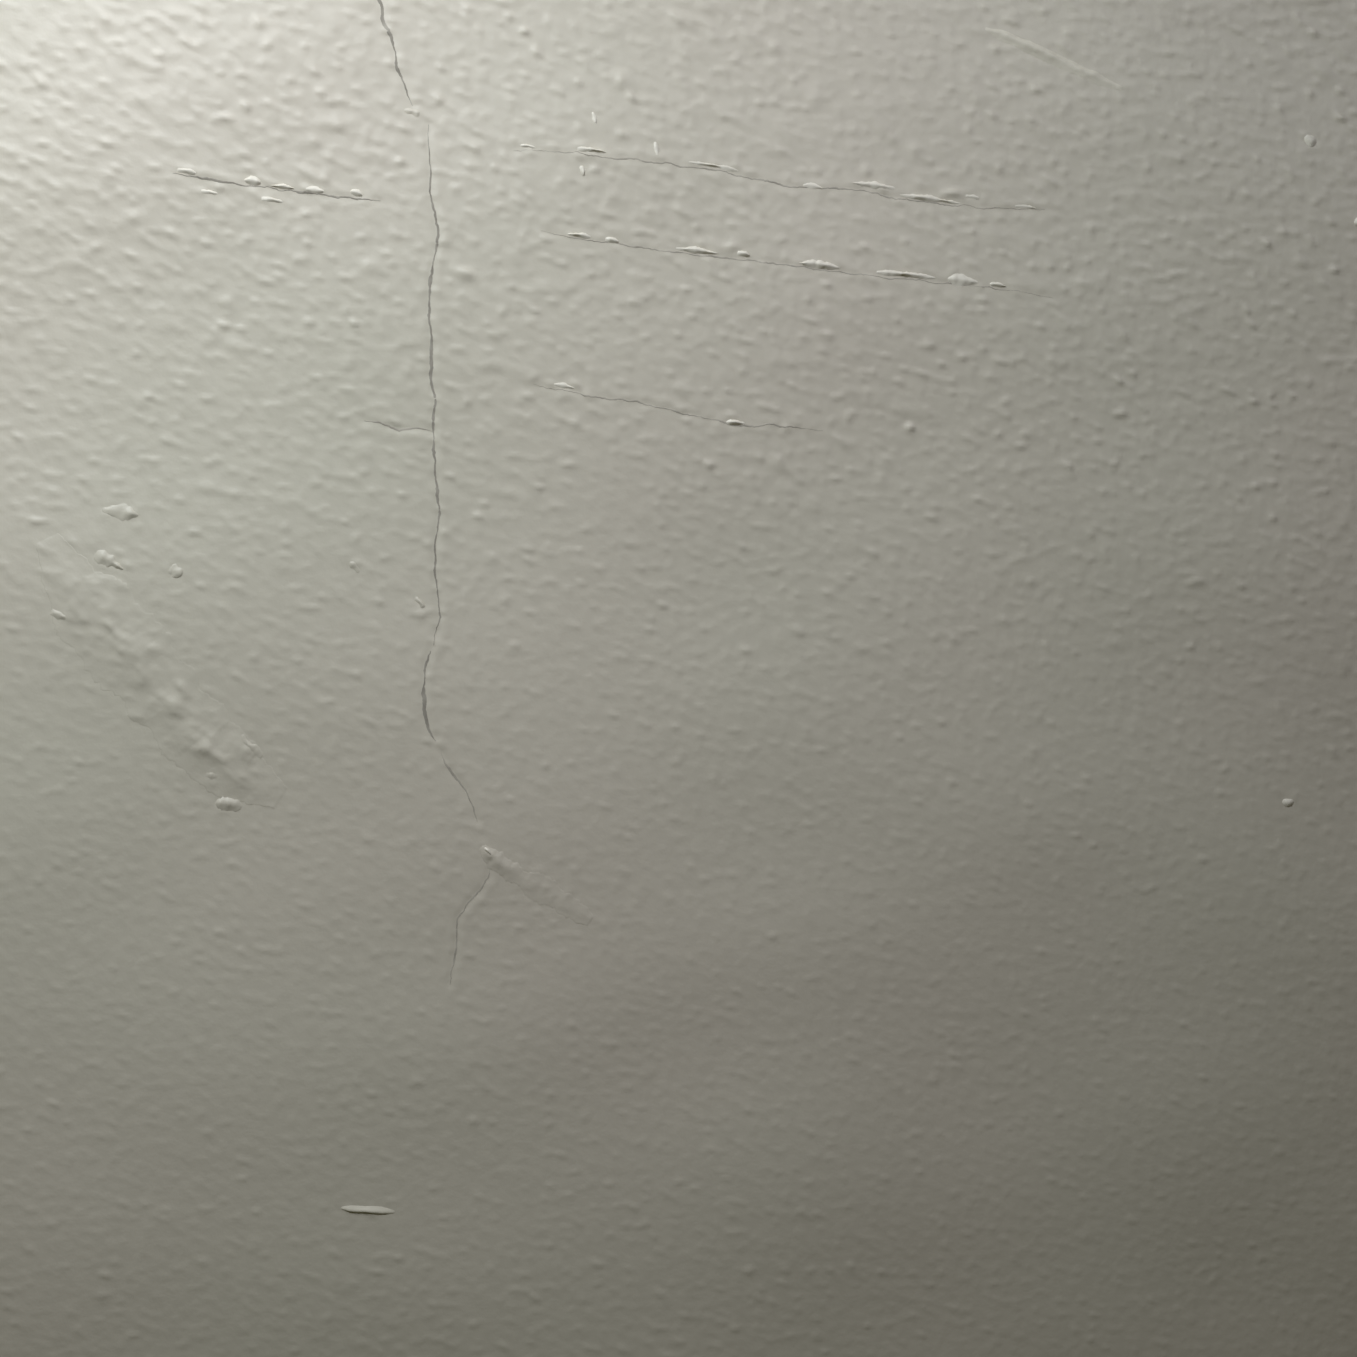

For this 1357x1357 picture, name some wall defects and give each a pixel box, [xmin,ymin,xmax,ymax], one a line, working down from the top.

crack [364,0,477,819]
crack [450,870,490,983]